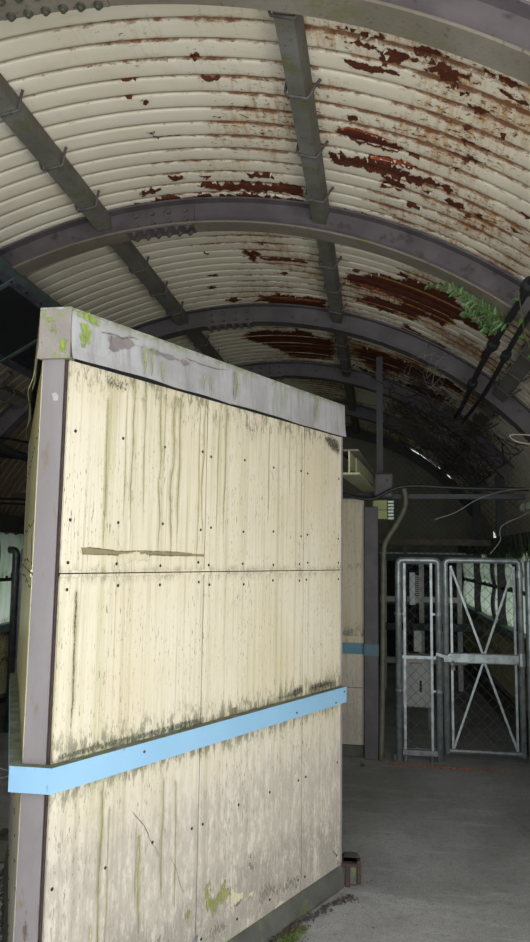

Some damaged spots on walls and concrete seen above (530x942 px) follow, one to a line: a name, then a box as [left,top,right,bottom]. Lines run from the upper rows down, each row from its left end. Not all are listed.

corrosion [344,26,490,115]
corrosion [483,68,529,106]
corrosion [134,171,306,204]
corrosion [328,115,483,220]
corrosion [447,124,491,171]
corrosion [255,291,328,308]
corrosion [339,268,497,359]
corrosion [242,329,335,360]
peeling [81,547,204,566]
leakage [252,681,334,710]
leakage [58,719,201,759]
peeling [146,863,305,942]